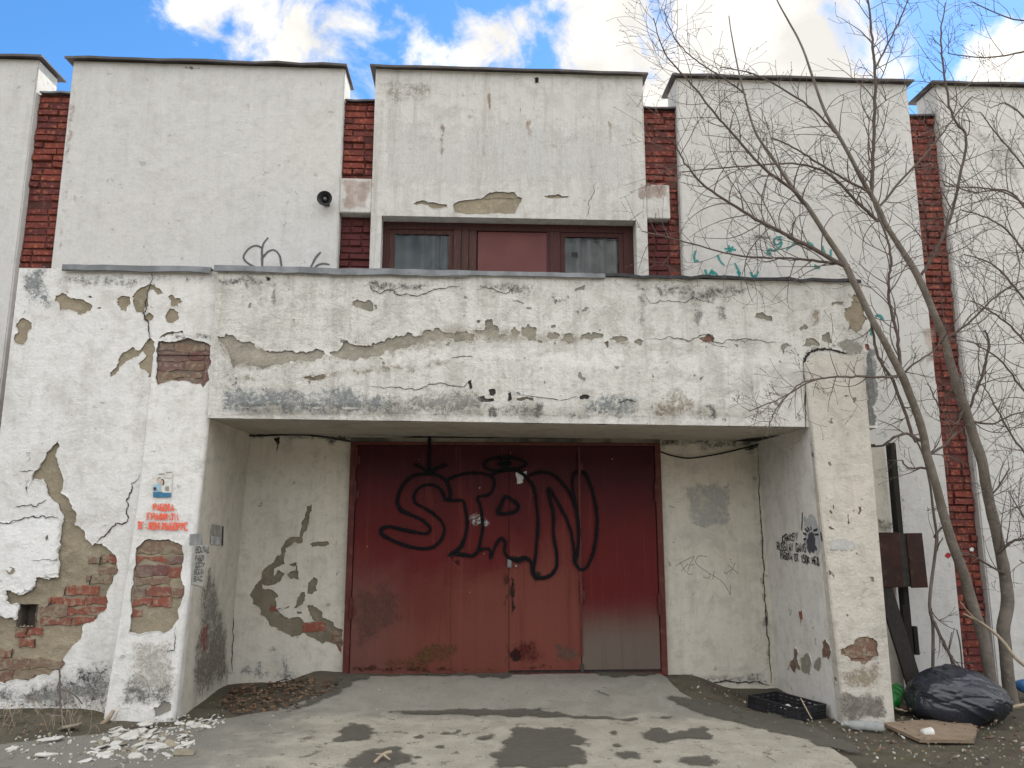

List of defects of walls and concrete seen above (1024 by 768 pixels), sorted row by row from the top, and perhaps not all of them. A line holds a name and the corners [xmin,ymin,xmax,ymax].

flaking render [413,191,522,215]
crack [143,274,153,343]
flaking render [109,284,644,388]
crack [365,285,522,303]
damp [223,376,543,418]
damp [570,395,636,419]
damp [651,394,728,420]
crack [97,474,141,542]
flaking render [0,440,186,685]
flaking render [249,504,343,653]
crack [713,446,772,685]
flaking render [787,636,879,676]